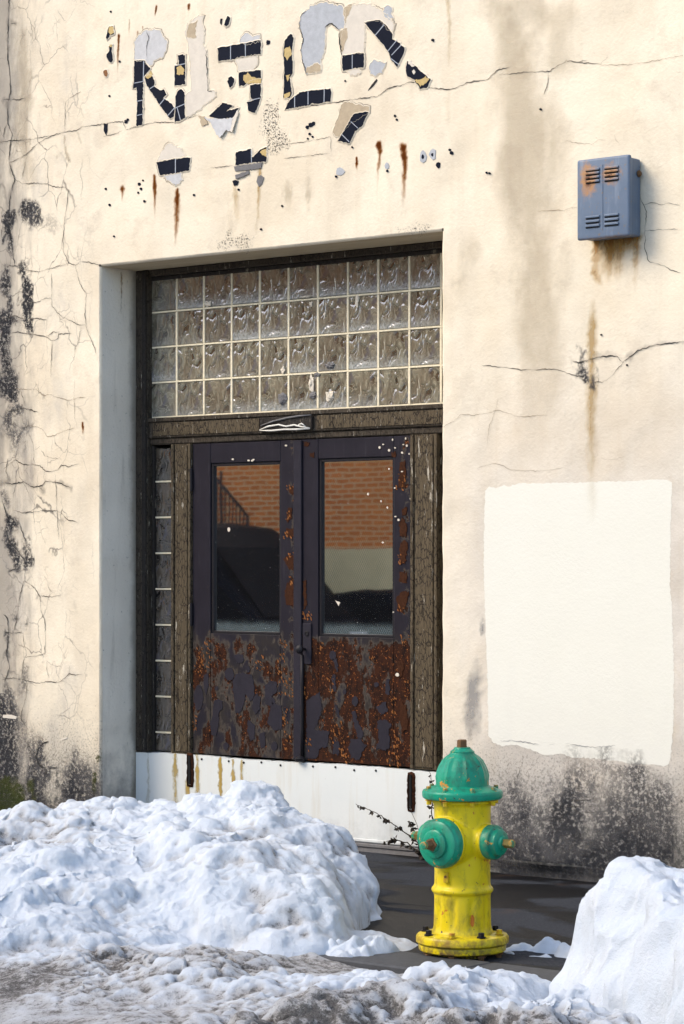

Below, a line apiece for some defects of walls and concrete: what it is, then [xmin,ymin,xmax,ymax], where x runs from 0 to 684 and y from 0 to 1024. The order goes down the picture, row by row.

peeling [184,14,217,126]
peeling [234,31,269,72]
peeling [298,0,397,90]
crack [311,55,681,106]
rust [594,237,640,273]
damp [0,262,34,443]
crack [3,0,197,725]
crack [482,342,678,383]
rust [396,507,409,613]
damp [0,689,51,809]
rust [186,753,194,787]
damp [490,763,674,882]